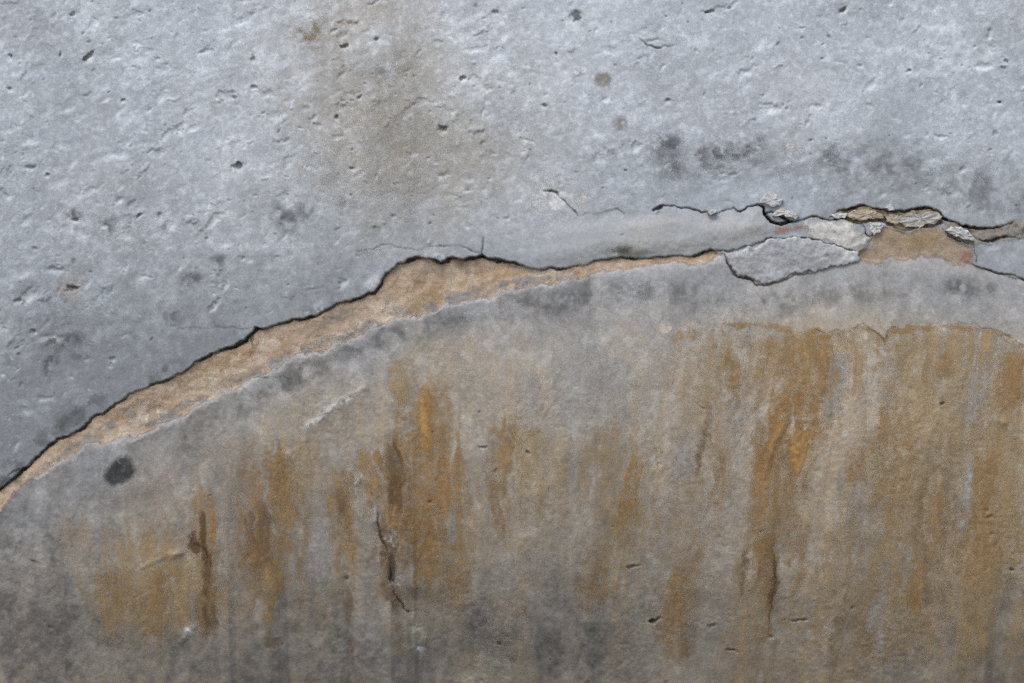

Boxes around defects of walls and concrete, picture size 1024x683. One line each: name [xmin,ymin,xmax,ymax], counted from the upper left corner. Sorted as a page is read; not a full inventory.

crack [405,244,568,271]
crack [693,250,786,286]
crack [737,205,1007,242]
crack [149,279,383,387]
spalling [0,191,1024,511]
crack [0,401,122,490]
leakage [108,457,133,484]
corrosion [188,496,218,626]
corrosion [237,446,297,622]
corrosion [360,386,464,608]
corrosion [754,324,838,605]